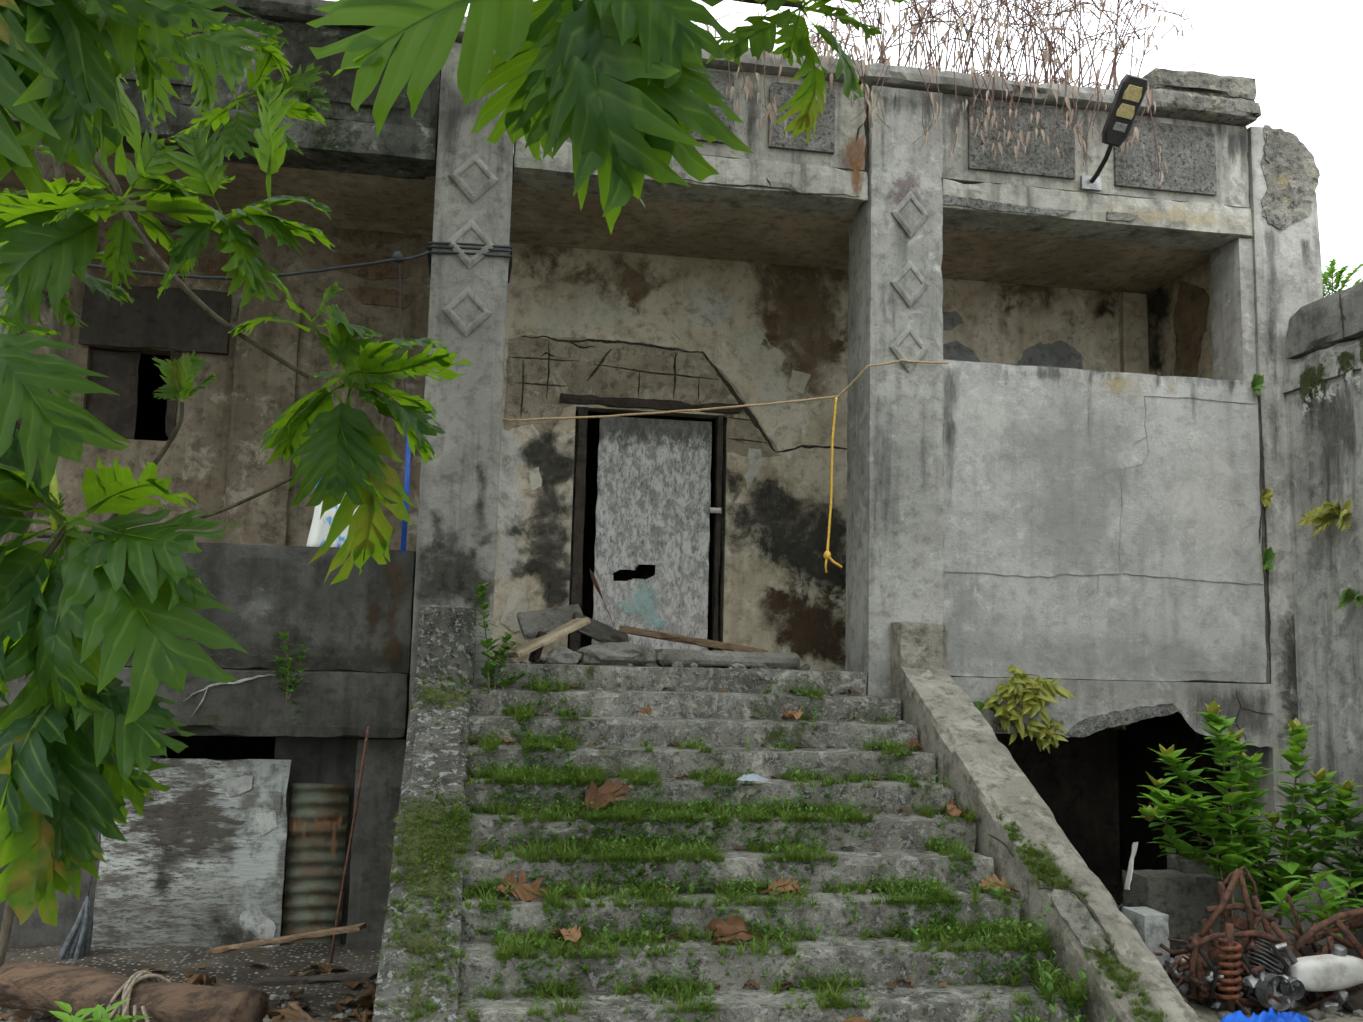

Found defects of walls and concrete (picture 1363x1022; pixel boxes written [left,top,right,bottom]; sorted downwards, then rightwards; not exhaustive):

spalling [1261,125,1320,230]
leakage [756,263,849,394]
crack [522,336,847,453]
leakage [418,513,495,607]
leakage [509,431,576,608]
leakage [721,468,846,667]
crack [943,394,1271,740]
spalling [989,703,1182,737]
leakage [123,780,246,893]
leakage [196,916,260,946]